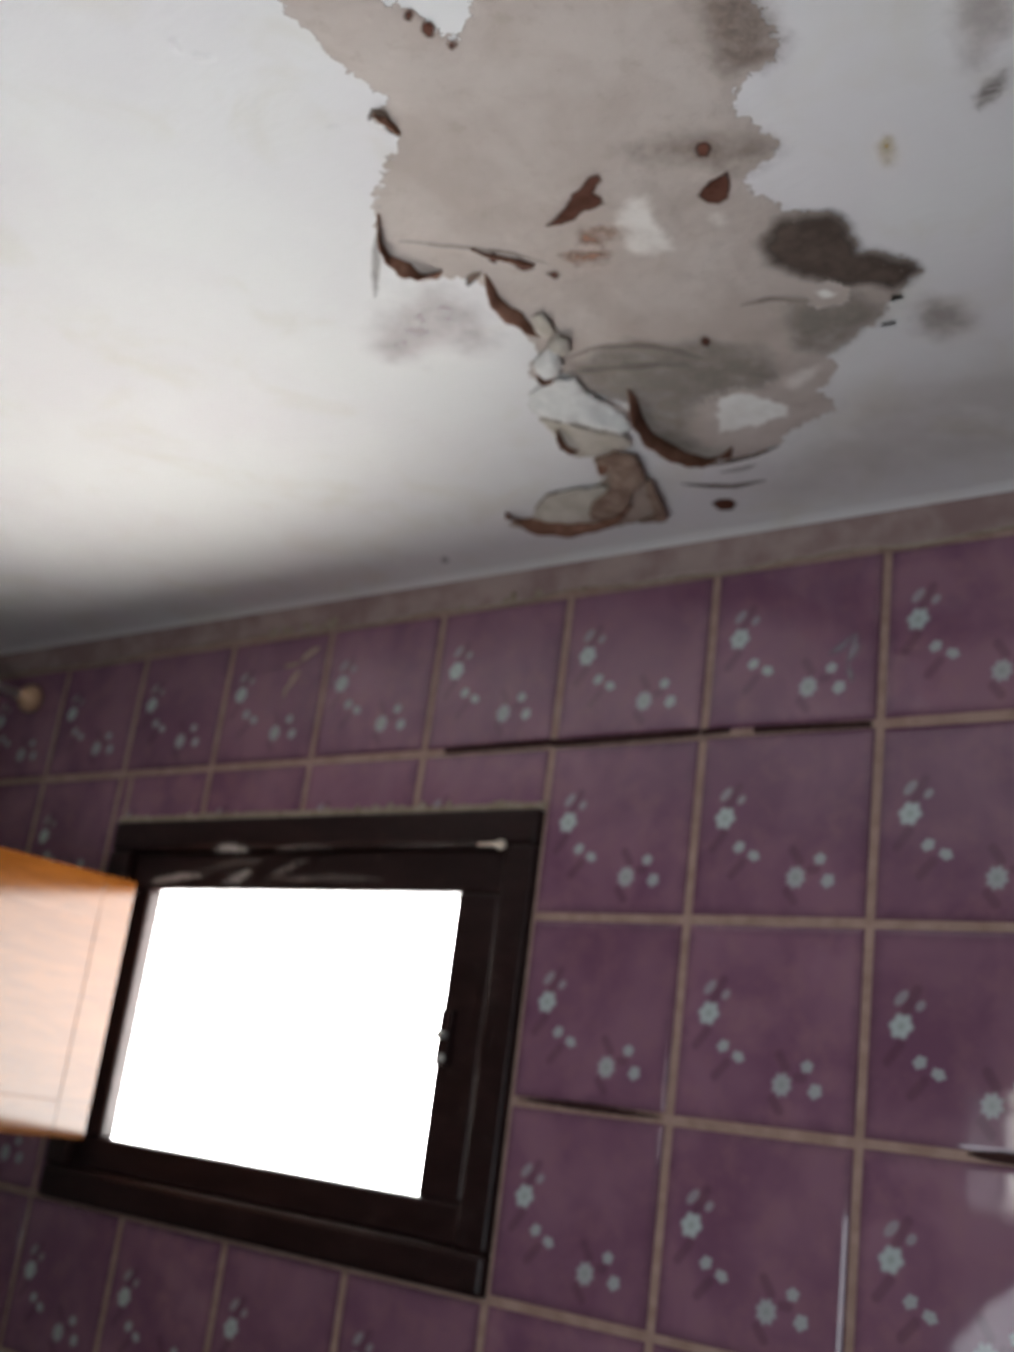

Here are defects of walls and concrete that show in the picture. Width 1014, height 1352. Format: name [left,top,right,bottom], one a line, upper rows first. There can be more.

spalling [278,0,924,538]
crack [444,721,872,754]